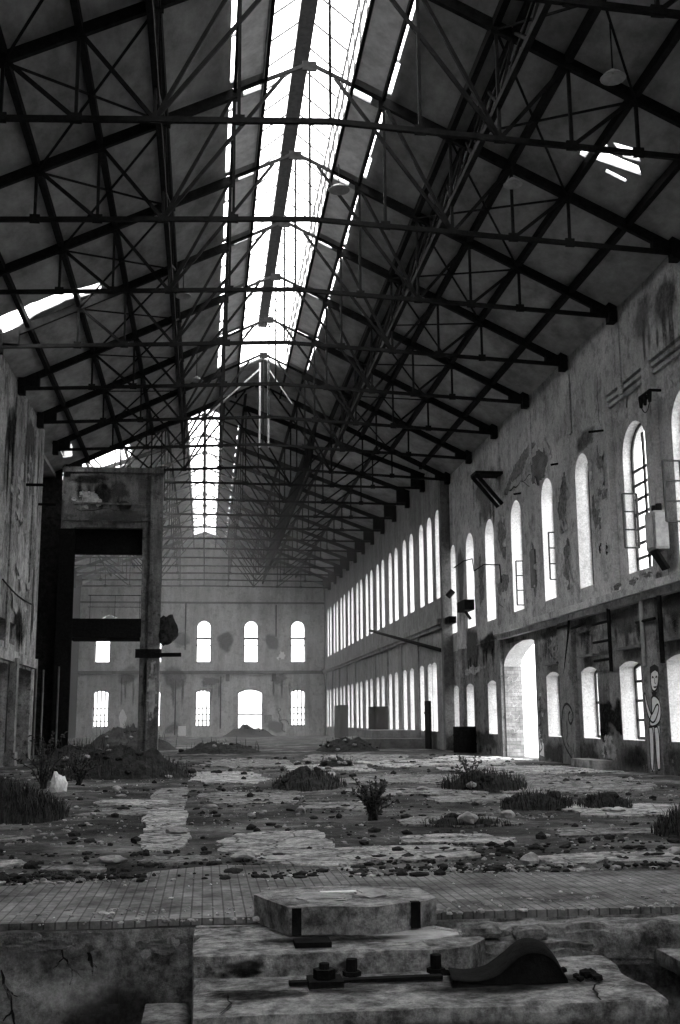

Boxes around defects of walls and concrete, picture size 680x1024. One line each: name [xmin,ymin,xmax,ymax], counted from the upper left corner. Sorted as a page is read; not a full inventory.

water stain [635,281,676,358]
peeling [501,441,552,496]
peeling [71,490,102,509]
water stain [218,633,233,652]
crack [53,950,97,985]
crack [0,970,18,1024]